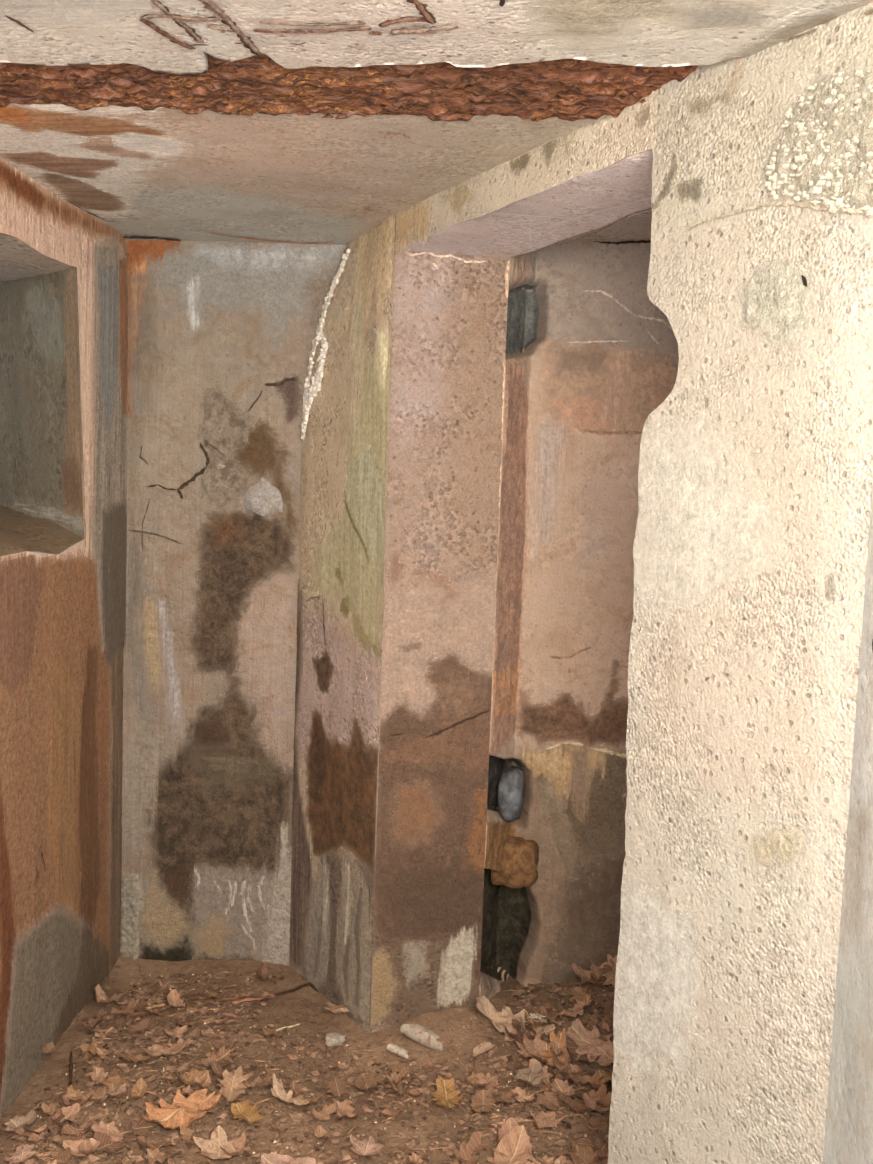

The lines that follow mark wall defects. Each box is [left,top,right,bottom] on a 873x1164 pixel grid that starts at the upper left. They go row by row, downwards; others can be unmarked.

spalling [139,0,458,55]
rust [0,157,180,382]
crack [248,377,297,411]
crack [130,443,210,549]
water stain [530,418,564,549]
water stain [0,238,532,1118]
crack [549,647,591,673]
water stain [516,661,628,758]
rust [0,550,113,1111]